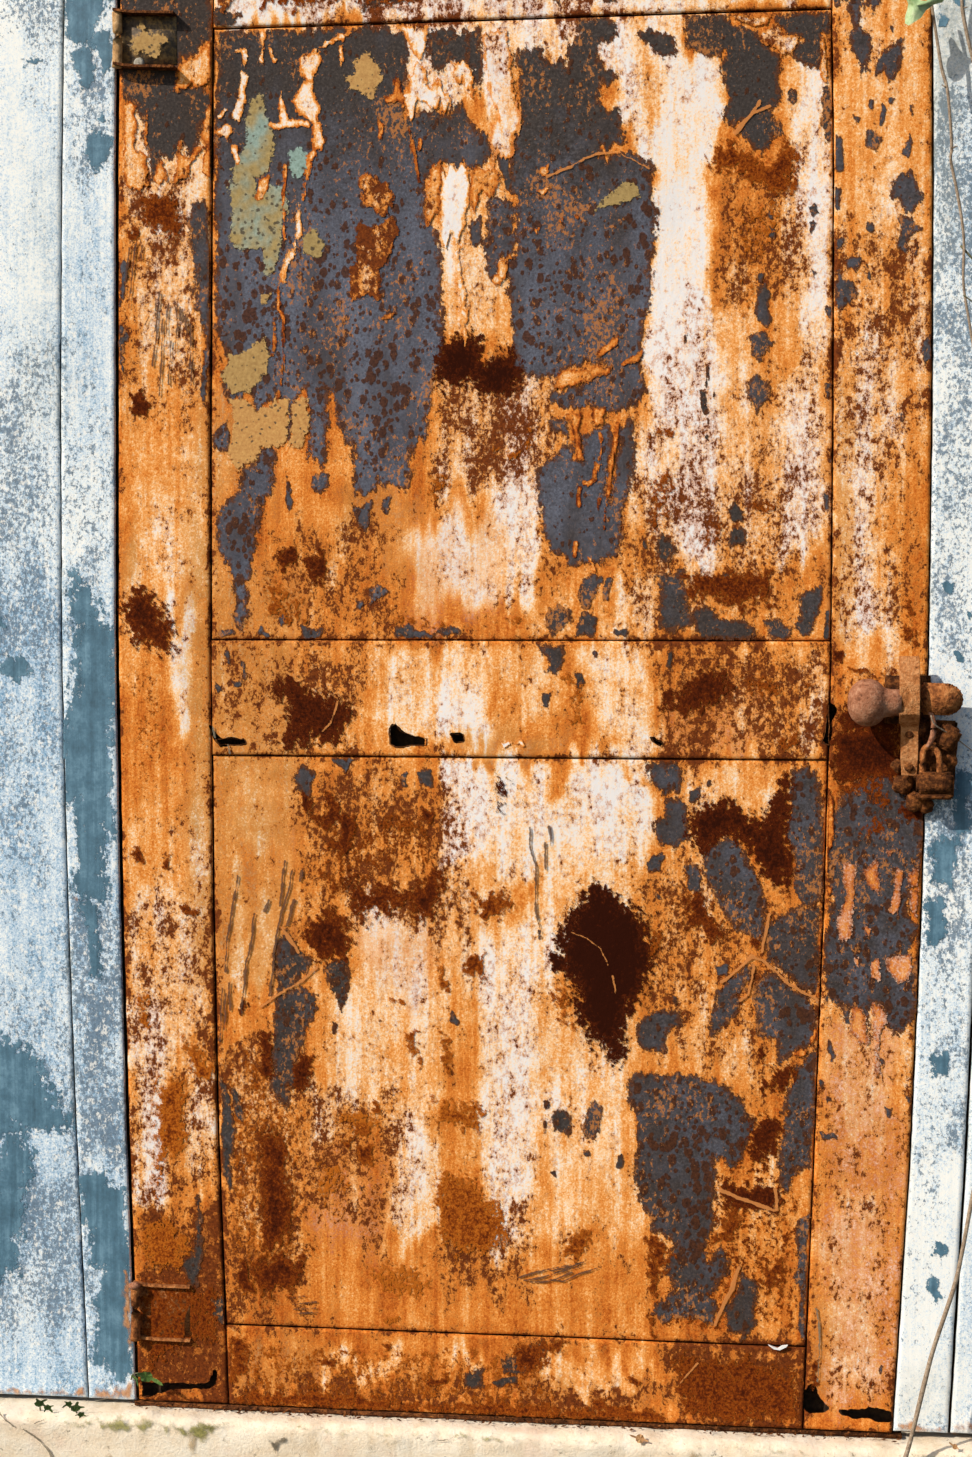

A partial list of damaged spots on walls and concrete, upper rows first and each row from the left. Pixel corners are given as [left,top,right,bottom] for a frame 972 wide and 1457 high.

rust [426,326,528,402]
peeling [64,0,924,693]
peeling [63,566,118,982]
rust [266,666,362,753]
rust [298,790,515,970]
rust [548,876,774,1071]
rust [682,770,803,904]
peeling [644,760,972,1195]
peeling [79,1165,134,1388]
rust [7,999,824,1428]
peeling [543,1100,603,1157]
peeling [616,995,760,1344]